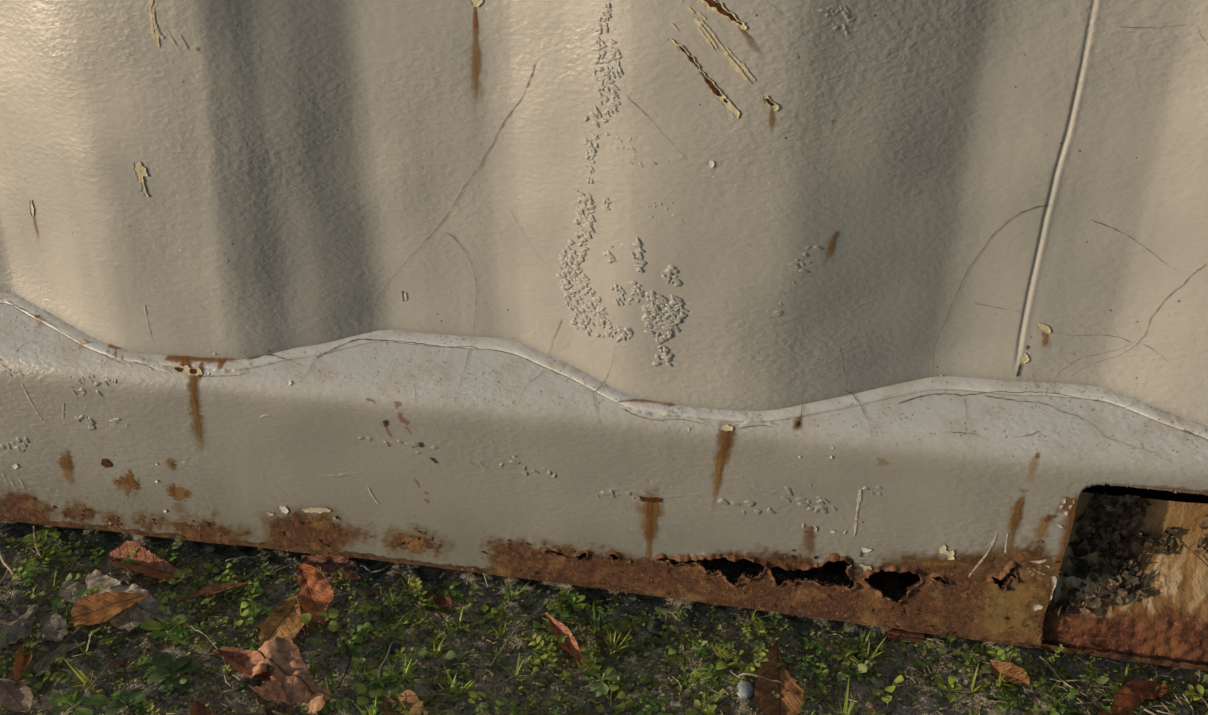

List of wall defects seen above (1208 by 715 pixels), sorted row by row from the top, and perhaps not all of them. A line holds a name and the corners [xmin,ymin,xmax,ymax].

spalling [696,0,751,39]
spalling [668,38,740,119]
peeling [133,162,148,198]
crack [247,62,613,433]
rust [165,355,234,436]
rust [59,451,73,482]
rust [101,459,139,495]
rust [716,424,733,490]
peeling [1047,497,1075,528]
rust [0,485,1208,671]
peeling [1030,554,1064,611]